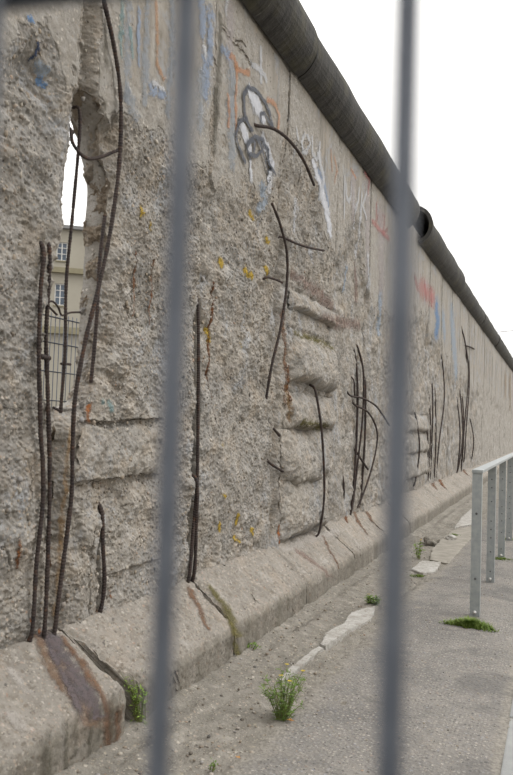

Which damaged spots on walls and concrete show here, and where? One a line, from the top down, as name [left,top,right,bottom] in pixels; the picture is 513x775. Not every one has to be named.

spalling [0,2,171,649]
rust [205,282,215,397]
spalling [176,0,388,585]
rust [280,313,292,422]
spalling [409,261,479,491]
rust [36,626,124,746]